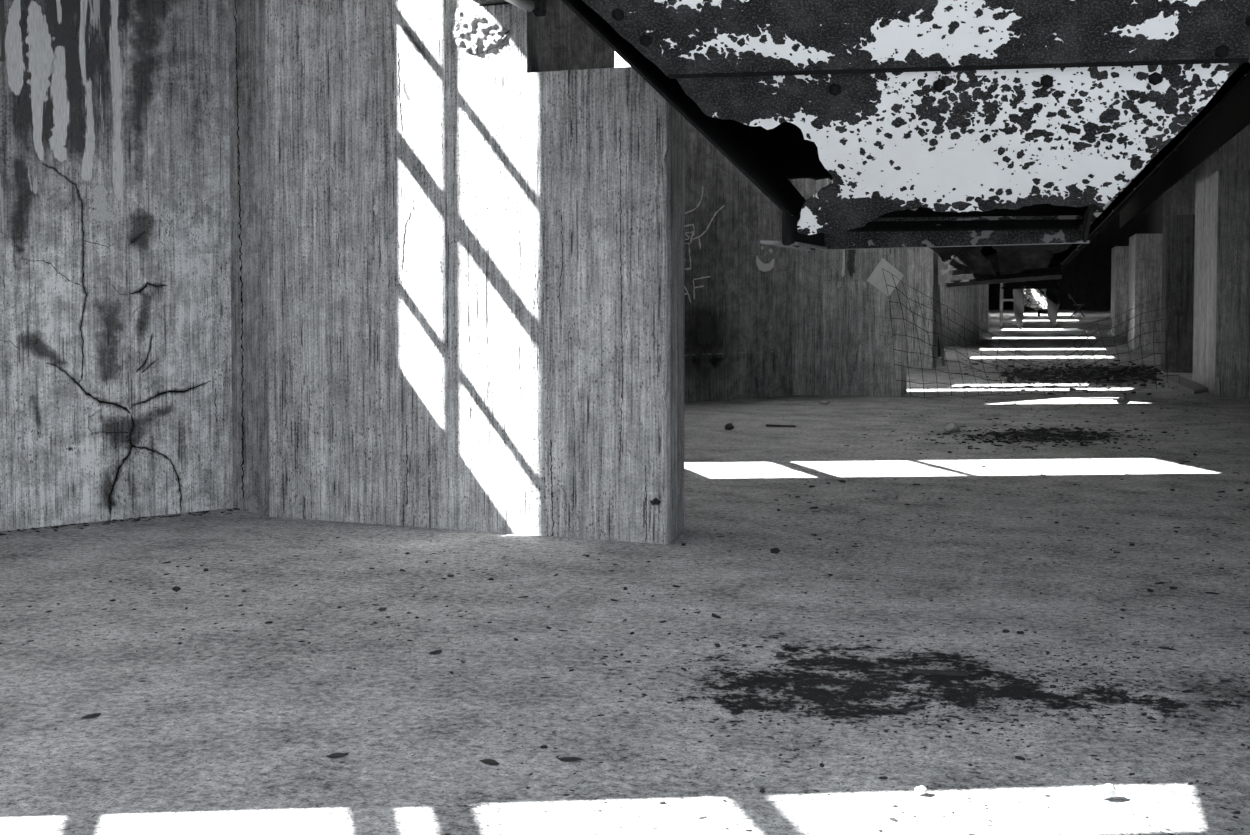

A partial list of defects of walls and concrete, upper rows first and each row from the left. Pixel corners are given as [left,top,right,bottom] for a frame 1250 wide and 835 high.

damp [0,0,170,253]
spalling [451,8,509,55]
crack [24,0,245,514]